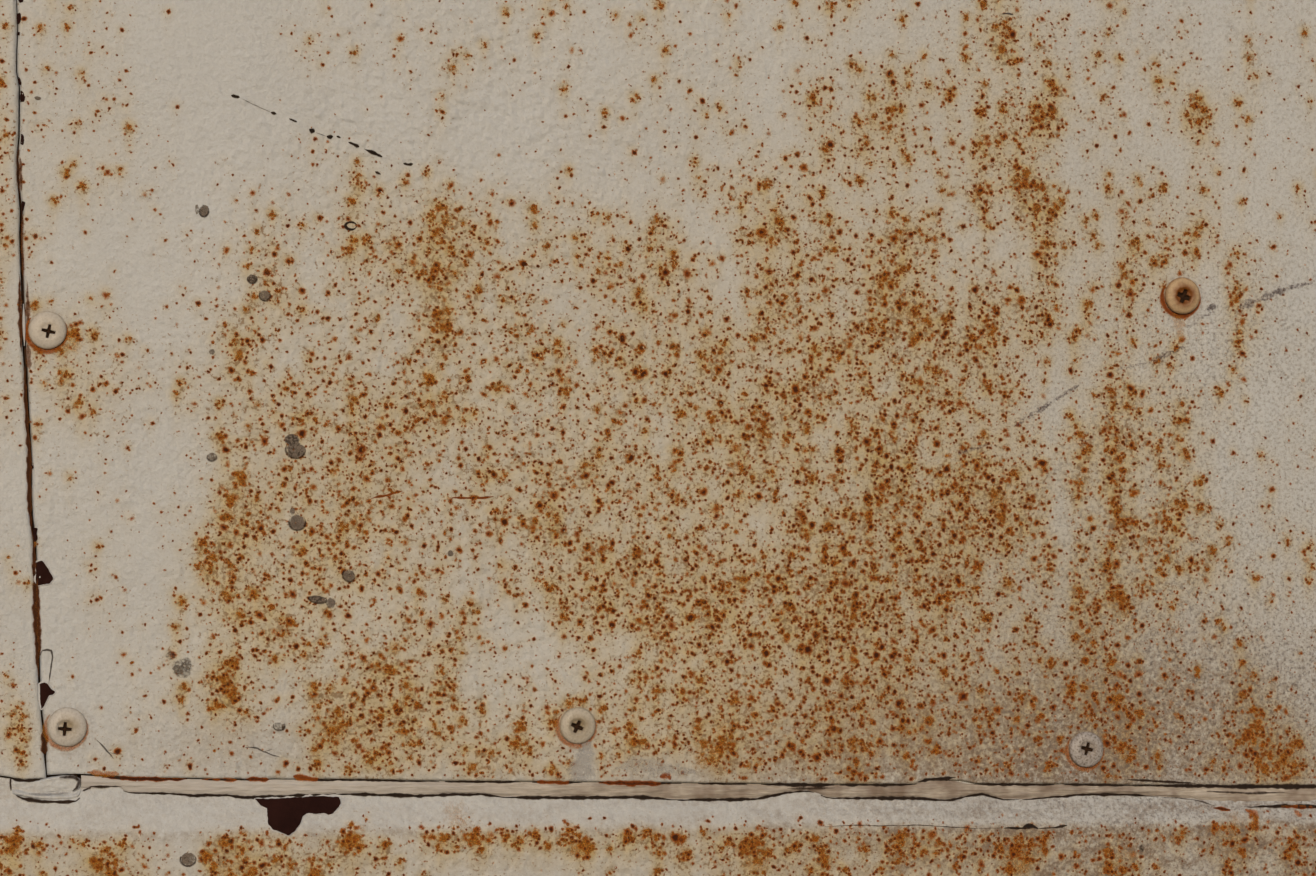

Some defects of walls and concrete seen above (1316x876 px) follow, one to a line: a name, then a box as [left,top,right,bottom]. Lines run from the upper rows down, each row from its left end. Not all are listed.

corrosion [797,0,870,71]
corrosion [1080,10,1128,85]
corrosion [1139,52,1224,145]
corrosion [1223,7,1314,117]
corrosion [1245,436,1316,609]
peeling [254,794,342,837]
corrosion [0,805,1316,876]